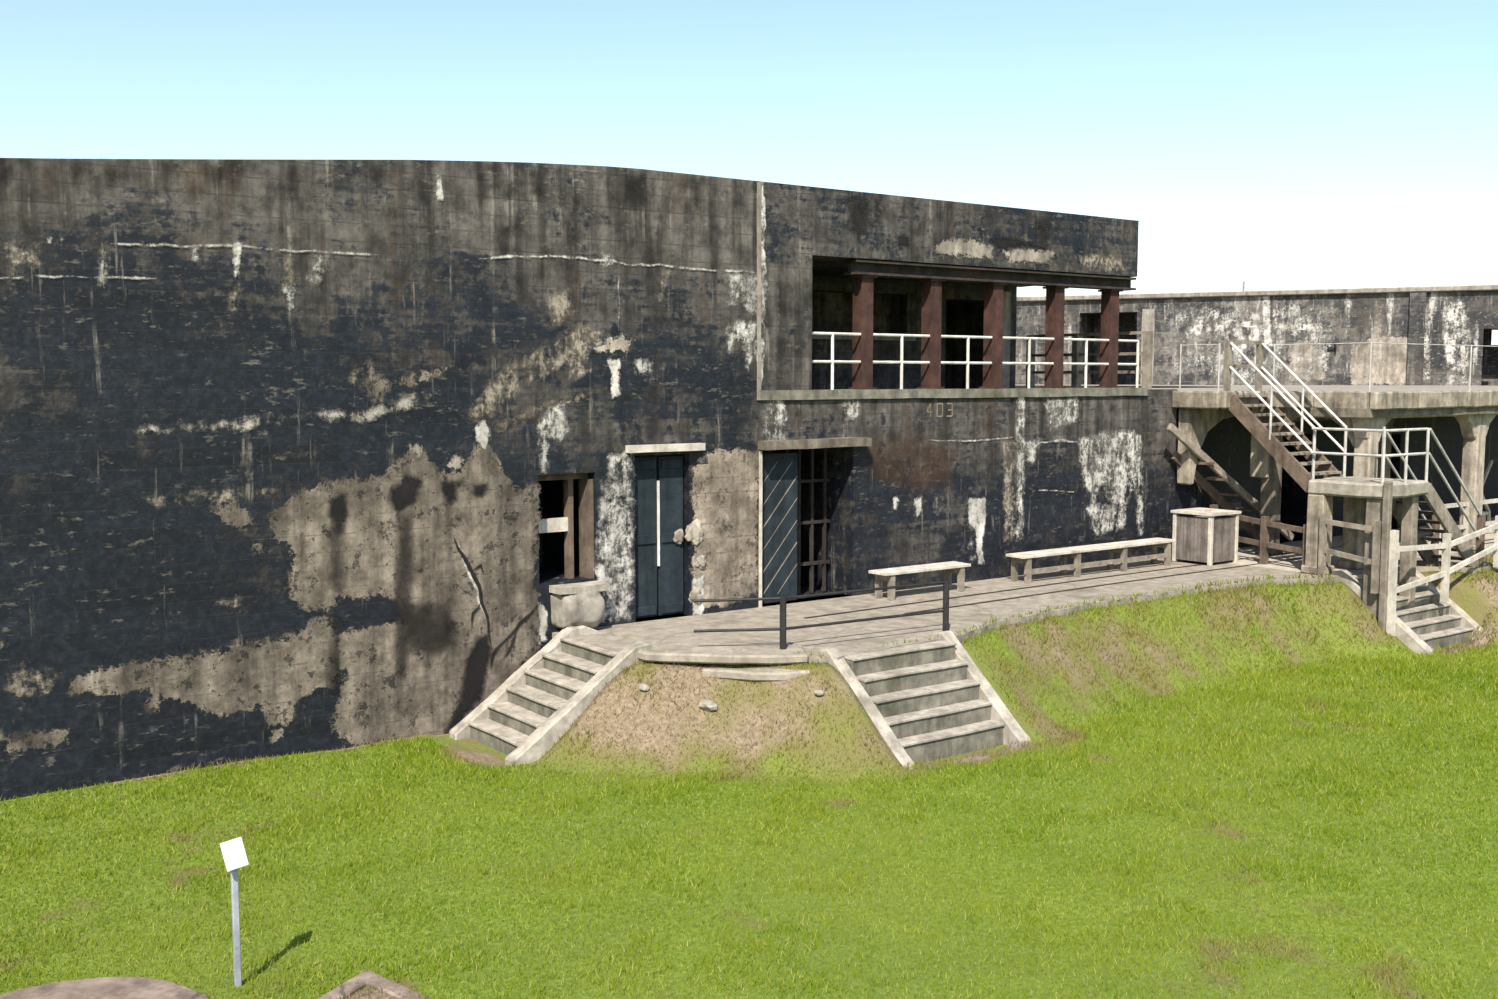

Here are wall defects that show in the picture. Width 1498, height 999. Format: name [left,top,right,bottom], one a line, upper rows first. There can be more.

leakage [608,359,650,398]
leakage [1173,296,1337,380]
leakage [1423,301,1471,385]
leakage [538,406,567,472]
spalling [8,290,600,747]
leakage [329,495,347,580]
leakage [390,476,453,679]
crack [454,538,537,669]
leakage [538,604,548,644]
peeling [595,454,633,623]
spalling [673,448,759,615]
leakage [445,635,491,734]